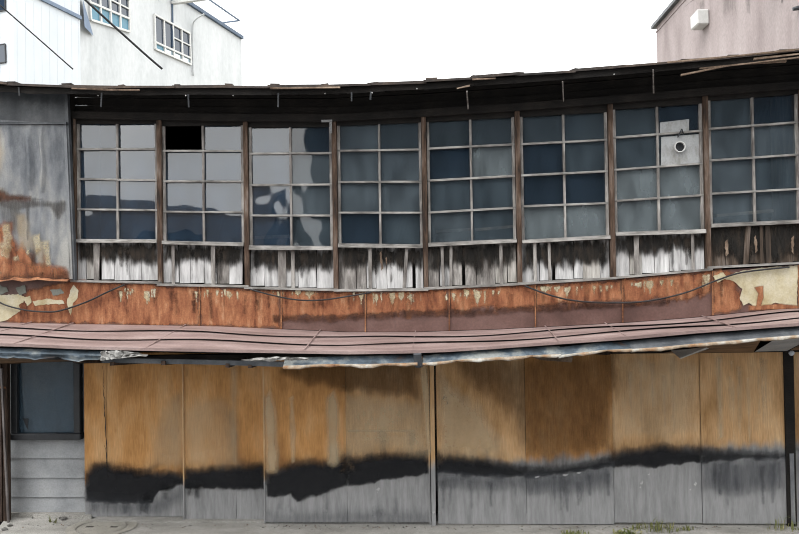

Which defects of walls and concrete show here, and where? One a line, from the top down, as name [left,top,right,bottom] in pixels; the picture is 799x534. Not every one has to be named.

rust [0,191,30,201]
peeling [0,285,78,322]
rust [0,224,798,328]
damp [79,224,799,281]
peeling [702,265,798,306]
damp [86,360,783,507]